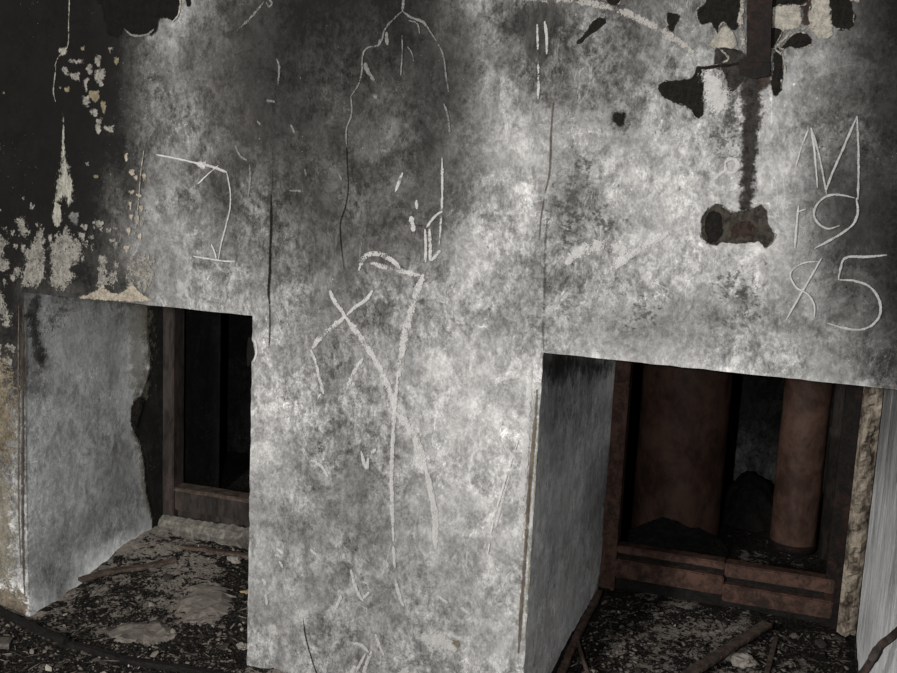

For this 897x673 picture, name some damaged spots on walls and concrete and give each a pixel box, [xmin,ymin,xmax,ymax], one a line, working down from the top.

spalling [60,0,191,134]
spalling [657,0,746,119]
spalling [757,0,859,97]
peeling [0,151,155,515]
crack [266,150,274,342]
crack [539,104,553,351]